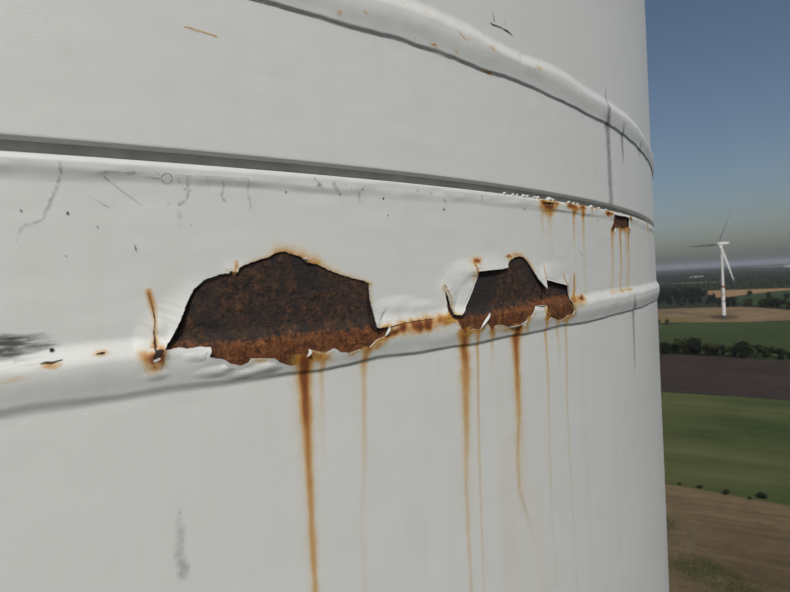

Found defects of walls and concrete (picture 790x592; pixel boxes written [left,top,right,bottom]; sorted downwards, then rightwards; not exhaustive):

corrosion [541,199,614,221]
peeling [611,215,629,231]
peeling [165,251,391,366]
peeling [445,256,574,331]
corrosion [296,351,329,574]